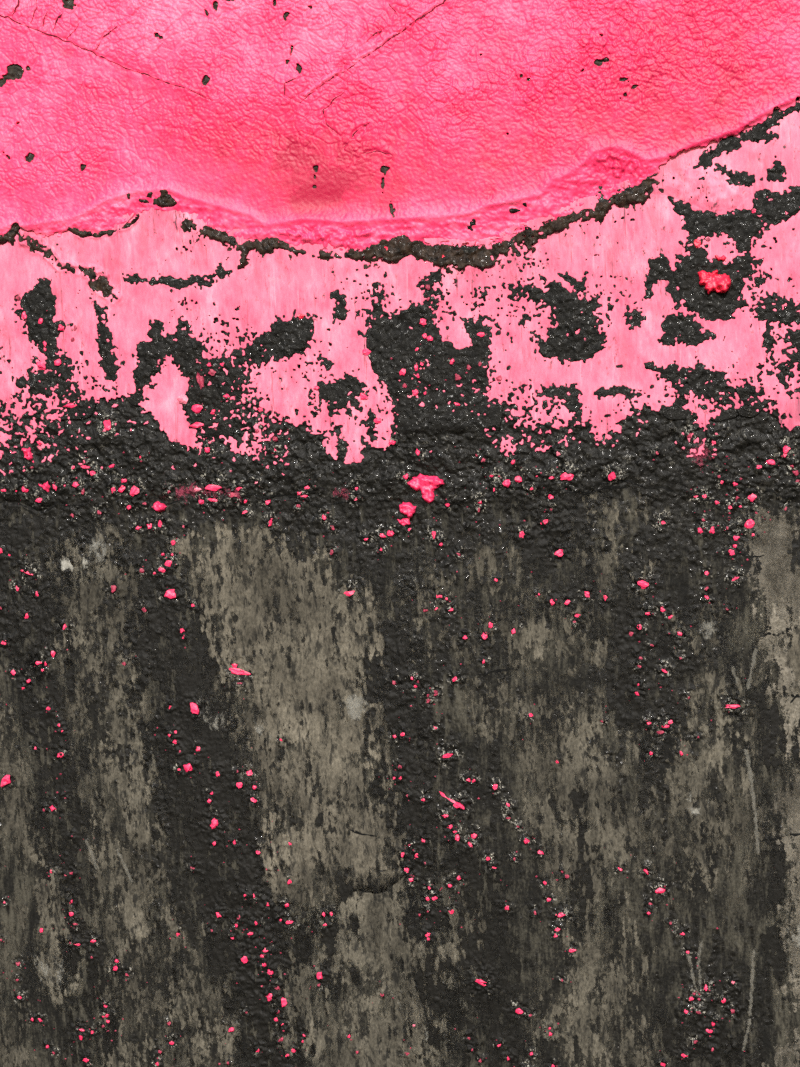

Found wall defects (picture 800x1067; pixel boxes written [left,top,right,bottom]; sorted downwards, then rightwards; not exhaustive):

peeling [0,0,800,492]
water stain [61,541,105,570]
water stain [347,695,363,718]
water stain [743,687,800,786]
water stain [306,910,358,996]
water stain [402,833,533,1067]